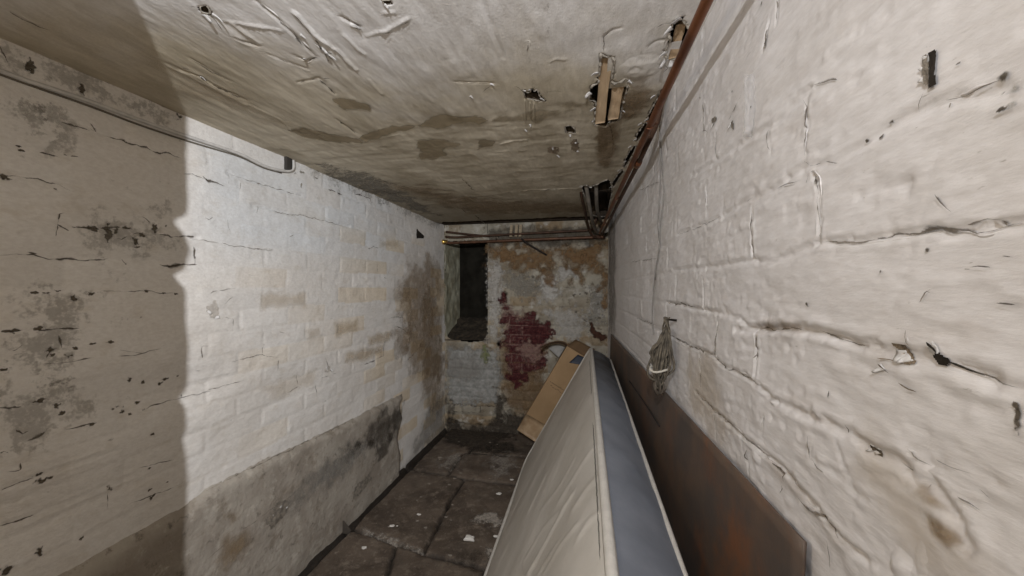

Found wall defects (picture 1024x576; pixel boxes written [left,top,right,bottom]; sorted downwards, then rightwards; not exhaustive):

leakage [333,98,371,111]
crack [62,122,174,156]
leakage [289,114,488,160]
crack [2,152,78,186]
crack [778,78,1022,267]
crack [9,213,125,263]
peeling [871,343,917,373]
peeling [926,341,985,376]
hole [1012,402,1021,435]
leakage [315,410,402,486]